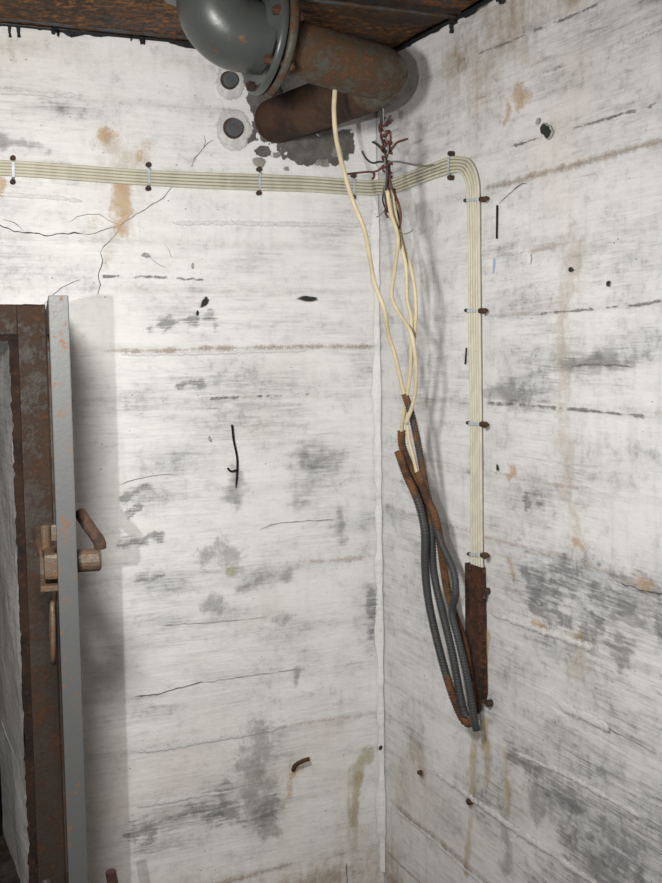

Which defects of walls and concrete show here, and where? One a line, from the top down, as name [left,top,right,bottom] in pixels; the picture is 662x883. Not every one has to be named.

corrosion [112,184,132,234]
crack [0,187,172,303]
crack [135,669,295,697]